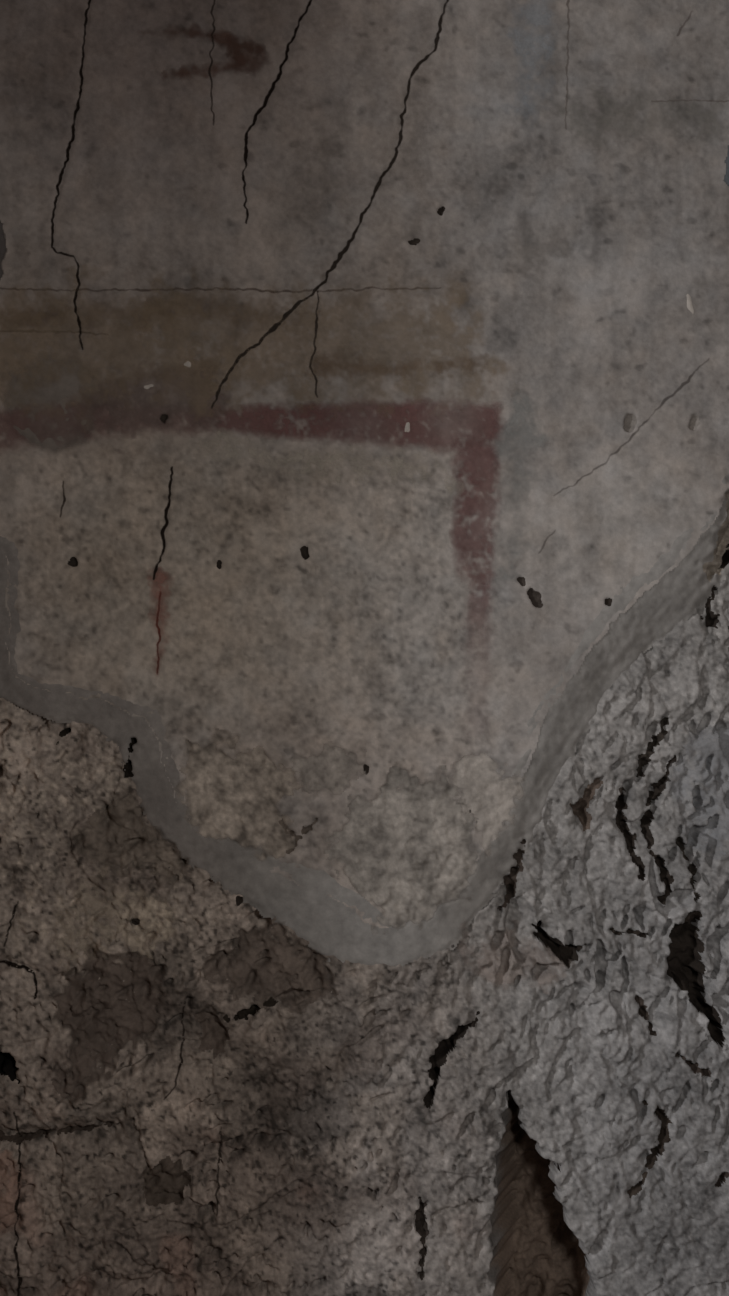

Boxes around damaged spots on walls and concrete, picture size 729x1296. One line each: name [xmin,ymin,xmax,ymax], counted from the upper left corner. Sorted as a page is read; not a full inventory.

crack [208,0,216,123]
crack [51,0,91,350]
crack [211,0,449,407]
crack [153,466,173,674]
spalling [517,577,543,608]
spalling [325,753,524,929]
spalling [52,948,167,1102]
spalling [202,924,337,1013]